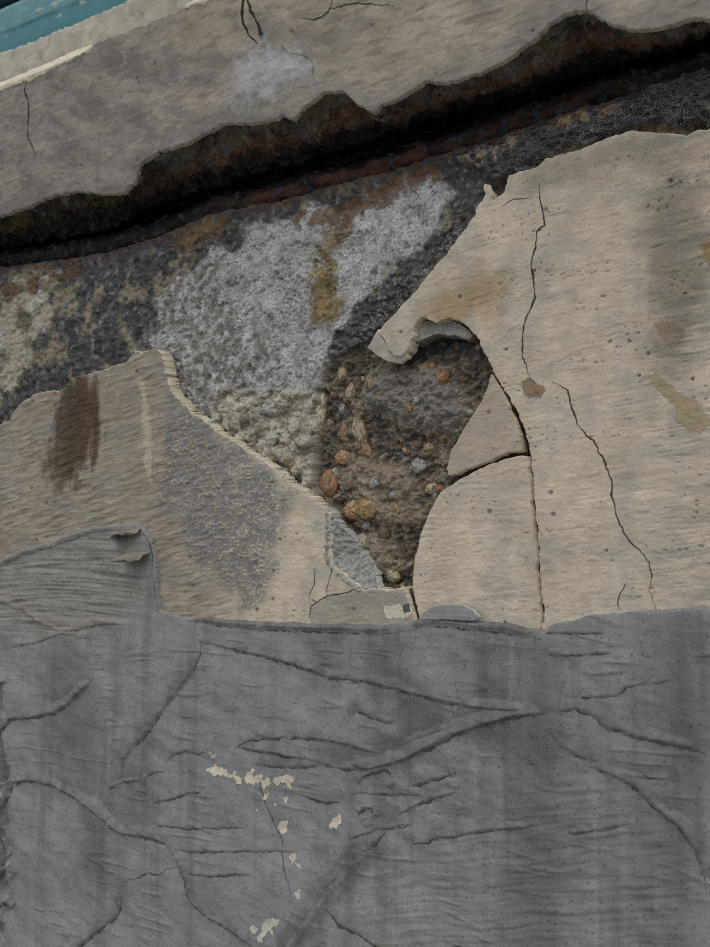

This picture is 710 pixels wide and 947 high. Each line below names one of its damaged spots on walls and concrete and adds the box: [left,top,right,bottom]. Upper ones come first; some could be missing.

crack [240,0,314,80]
crack [301,0,390,20]
spalling [0,10,710,252]
rust [170,214,227,251]
rust [292,162,438,323]
spalling [0,67,710,619]
crack [450,374,534,482]
crack [503,184,656,608]
crack [409,588,420,619]
peeling [206,751,294,806]
peeling [329,814,342,829]
peeling [250,918,281,944]